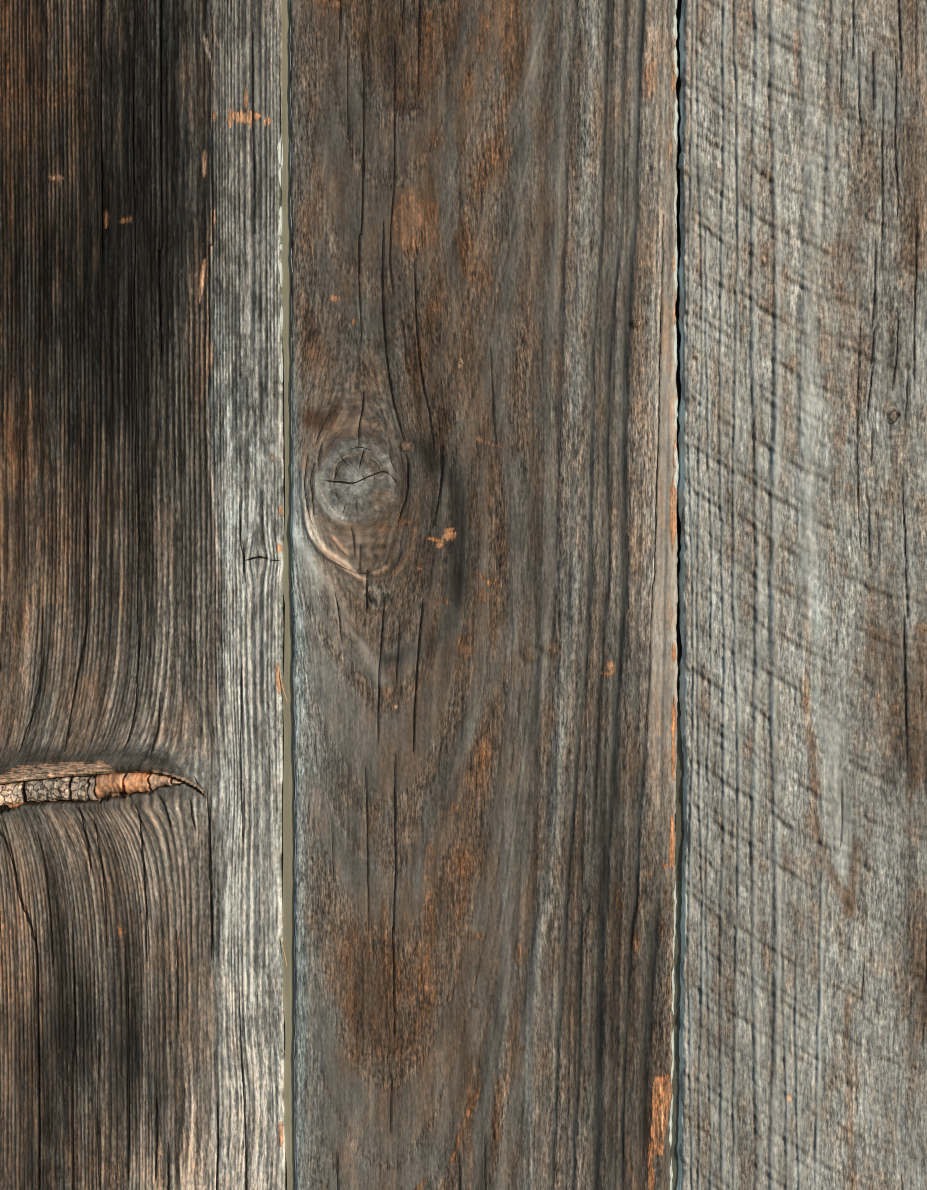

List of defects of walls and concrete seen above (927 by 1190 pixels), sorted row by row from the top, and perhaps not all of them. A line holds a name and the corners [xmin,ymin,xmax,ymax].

crack [0,832,100,1190]